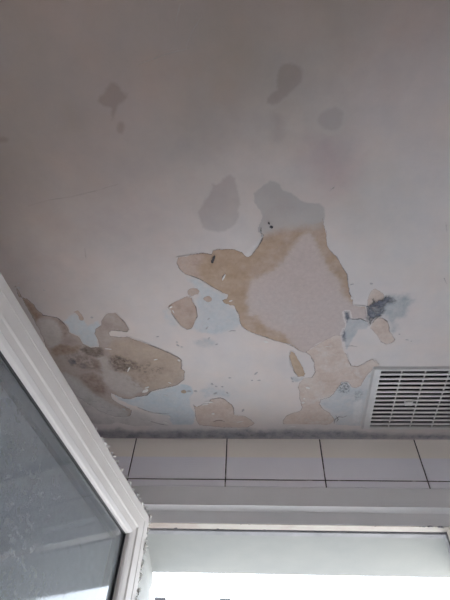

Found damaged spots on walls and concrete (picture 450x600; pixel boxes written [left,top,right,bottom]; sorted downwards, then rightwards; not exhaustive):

leakage [157,57,385,238]
peeling [14,285,256,428]
peeling [168,205,400,427]
leakage [367,286,422,338]
leakage [93,423,450,440]